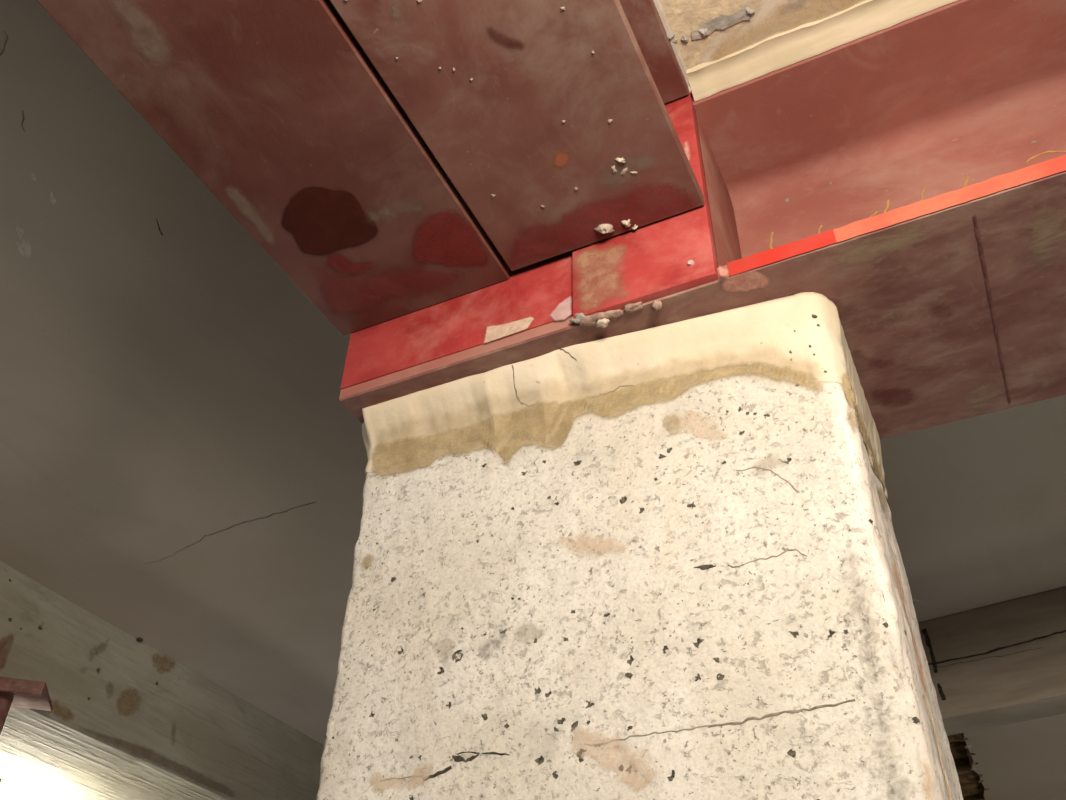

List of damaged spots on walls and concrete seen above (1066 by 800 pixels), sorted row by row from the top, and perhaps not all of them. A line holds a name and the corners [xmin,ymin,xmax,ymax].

damp [282,187,378,255]
damp [372,363,819,476]
crack [146,502,316,564]
crack [696,549,807,570]
crack [922,629,1066,701]
crack [584,699,855,745]
spalling [947,733,991,800]